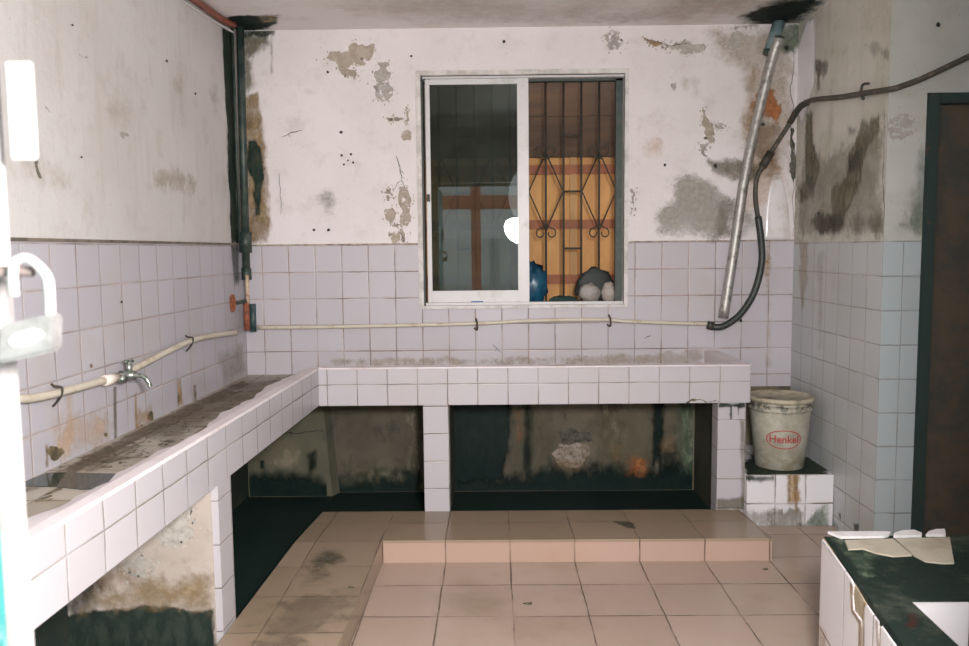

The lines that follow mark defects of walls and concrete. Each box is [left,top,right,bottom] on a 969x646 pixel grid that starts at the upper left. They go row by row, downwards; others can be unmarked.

peeling [601,26,628,54]
spalling [641,0,818,57]
peeling [316,39,412,141]
peeling [381,178,414,249]
leakage [659,175,733,237]
rust [752,90,782,165]
leakage [800,111,819,199]
leakage [812,119,879,233]
leakage [338,405,422,492]
peeling [552,427,593,468]
leakage [454,403,693,491]
rust [788,475,799,511]